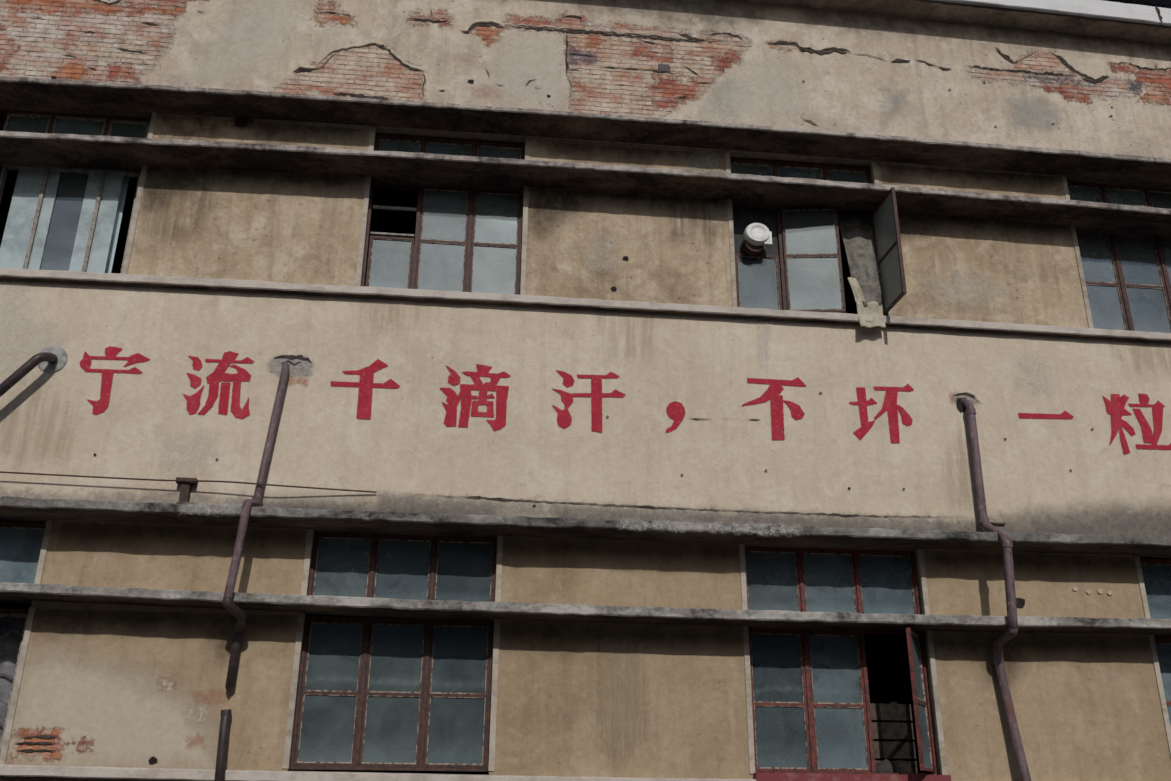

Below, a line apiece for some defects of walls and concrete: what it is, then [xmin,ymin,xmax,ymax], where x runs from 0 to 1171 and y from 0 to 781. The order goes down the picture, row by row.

peeling [0,0,208,84]
peeling [310,0,357,27]
peeling [271,40,426,102]
peeling [407,8,752,118]
crack [767,38,951,70]
peeling [967,46,1171,117]
peeling [0,654,214,781]